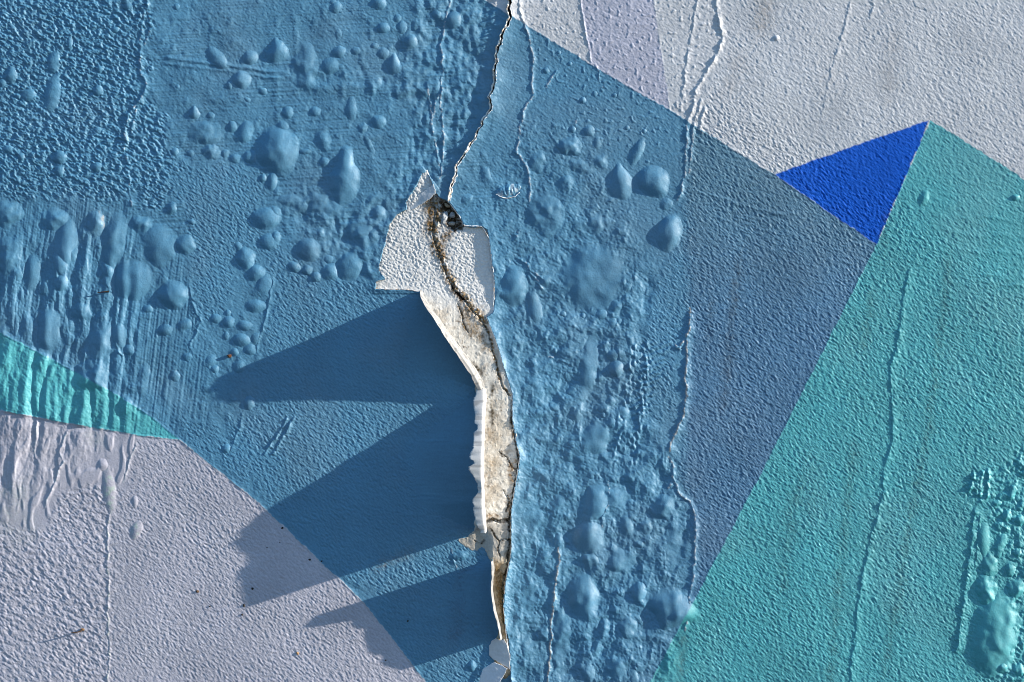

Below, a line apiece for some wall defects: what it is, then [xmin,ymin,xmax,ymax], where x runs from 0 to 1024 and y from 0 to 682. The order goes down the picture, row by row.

peeling [376,170,520,682]
crack [425,0,559,617]
crack [667,307,700,633]
crack [675,0,727,203]